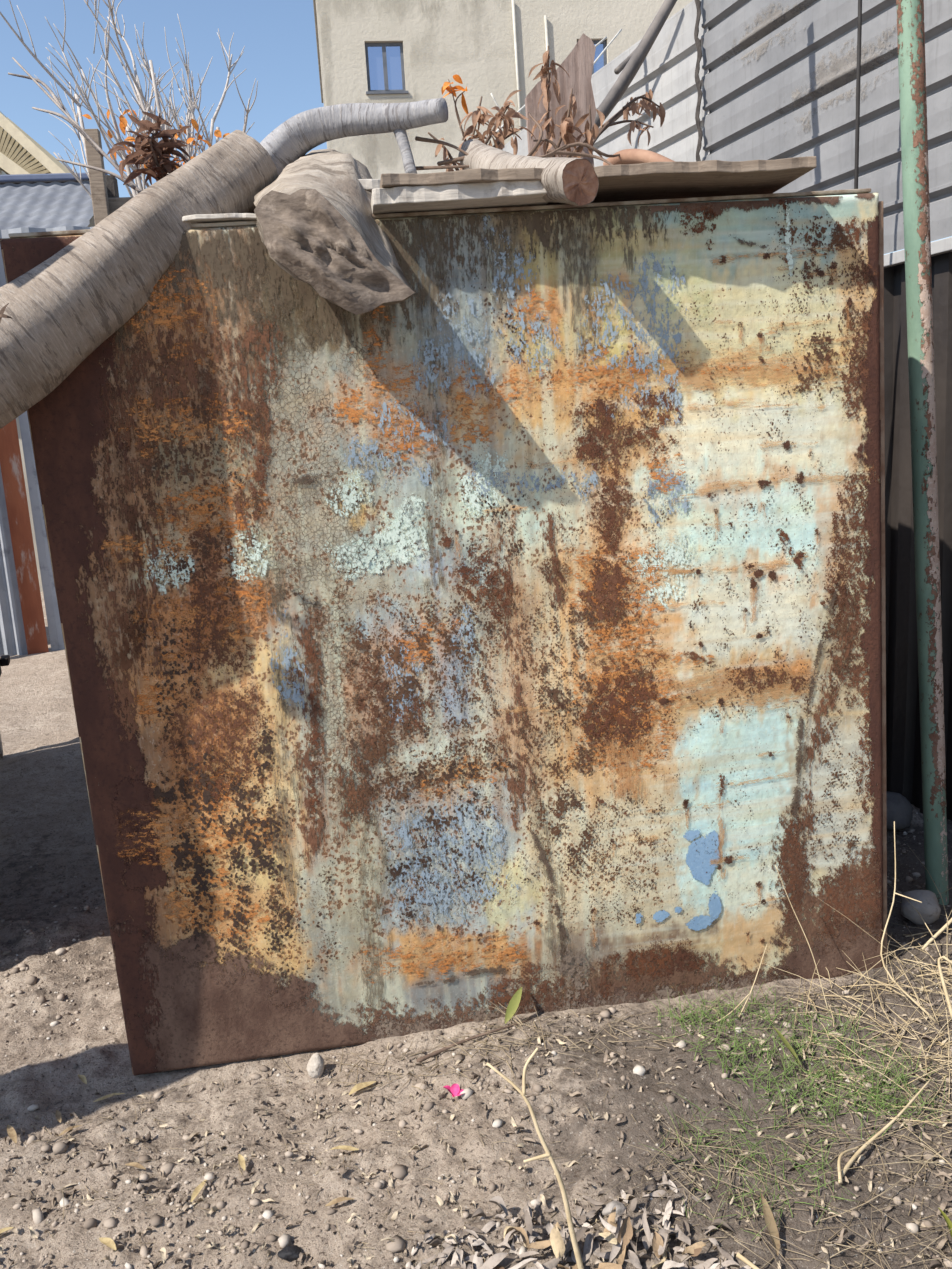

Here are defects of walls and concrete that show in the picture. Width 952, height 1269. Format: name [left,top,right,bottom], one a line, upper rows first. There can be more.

rust [0,236,80,283]
rust [28,193,884,1076]
peeling [322,203,880,947]
rust [896,0,947,818]